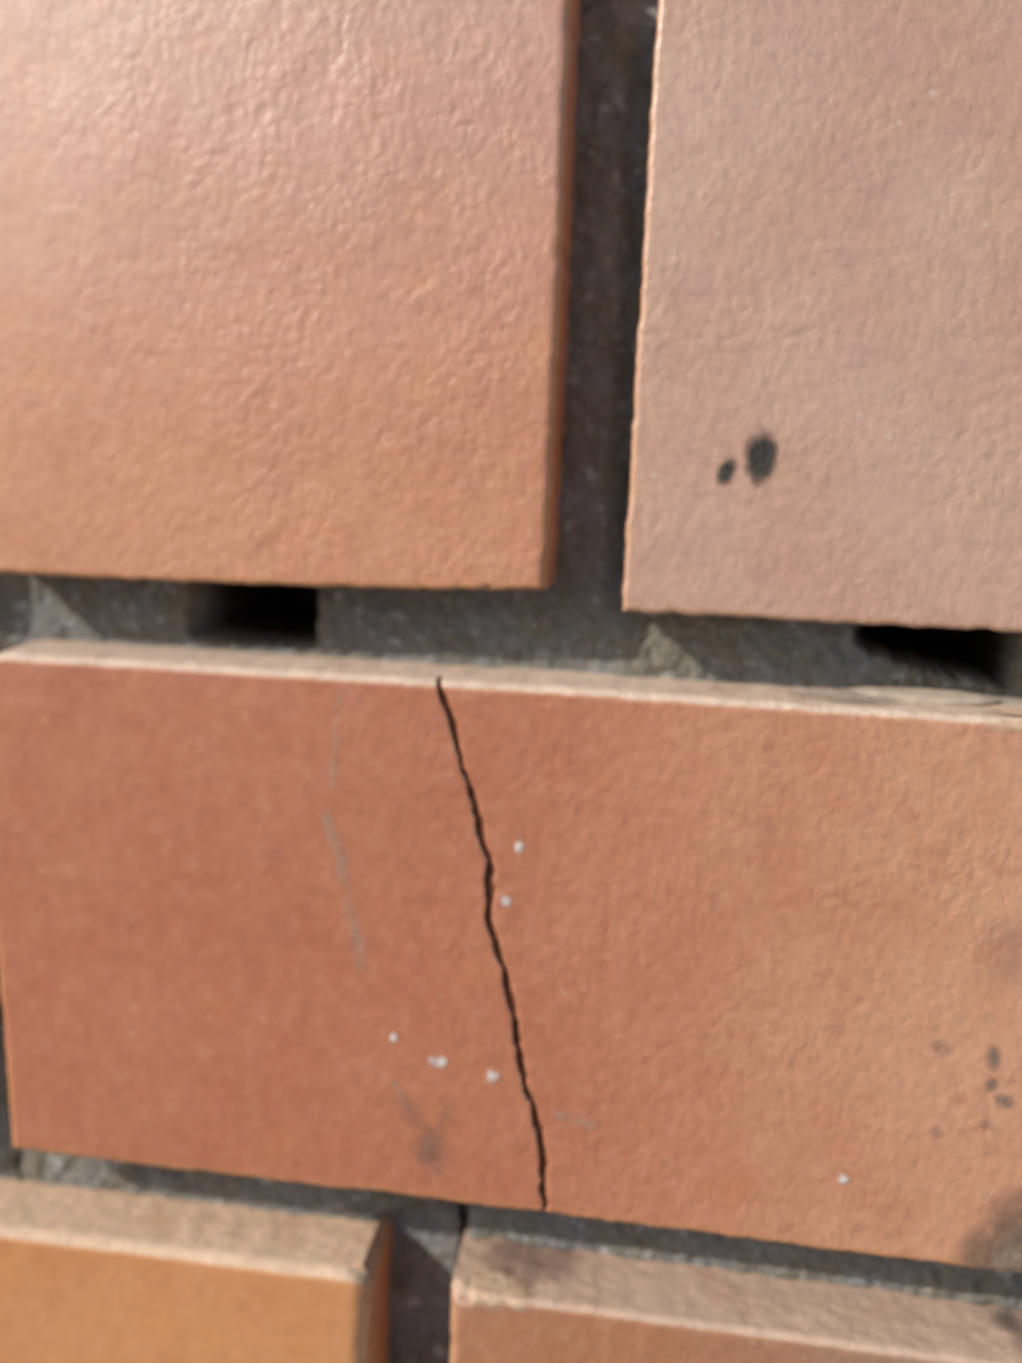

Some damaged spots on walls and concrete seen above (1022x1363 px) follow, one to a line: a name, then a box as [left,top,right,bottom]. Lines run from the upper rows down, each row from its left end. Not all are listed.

damp [718,437,776,483]
crack [436,676,548,1209]
damp [970,1212,1022,1273]